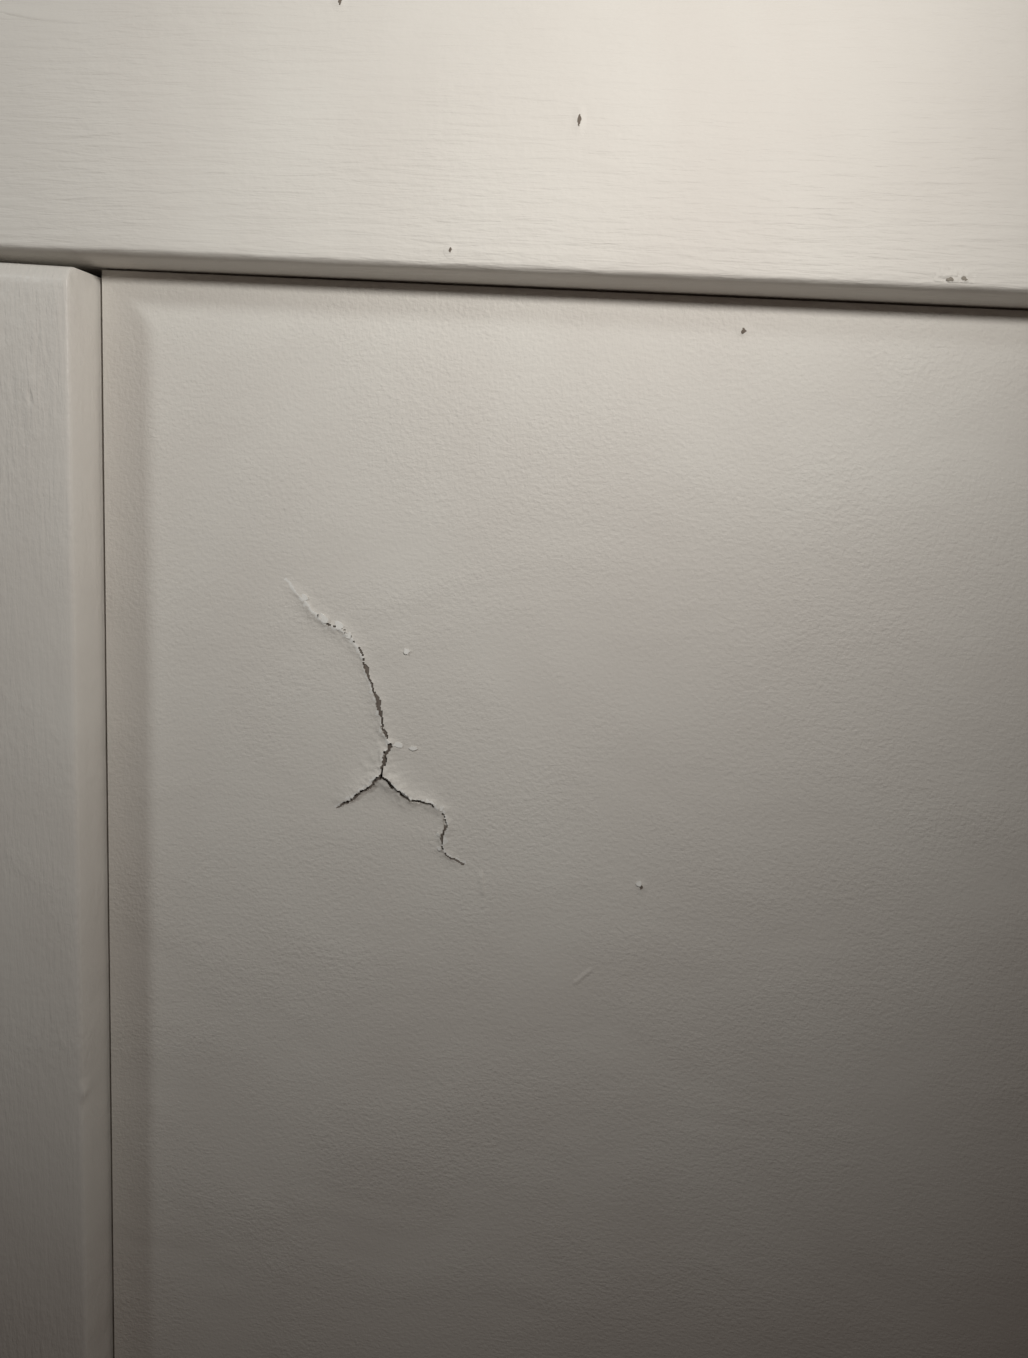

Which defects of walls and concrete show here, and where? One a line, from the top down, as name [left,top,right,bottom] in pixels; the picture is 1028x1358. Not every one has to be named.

crack [281,576,485,896]